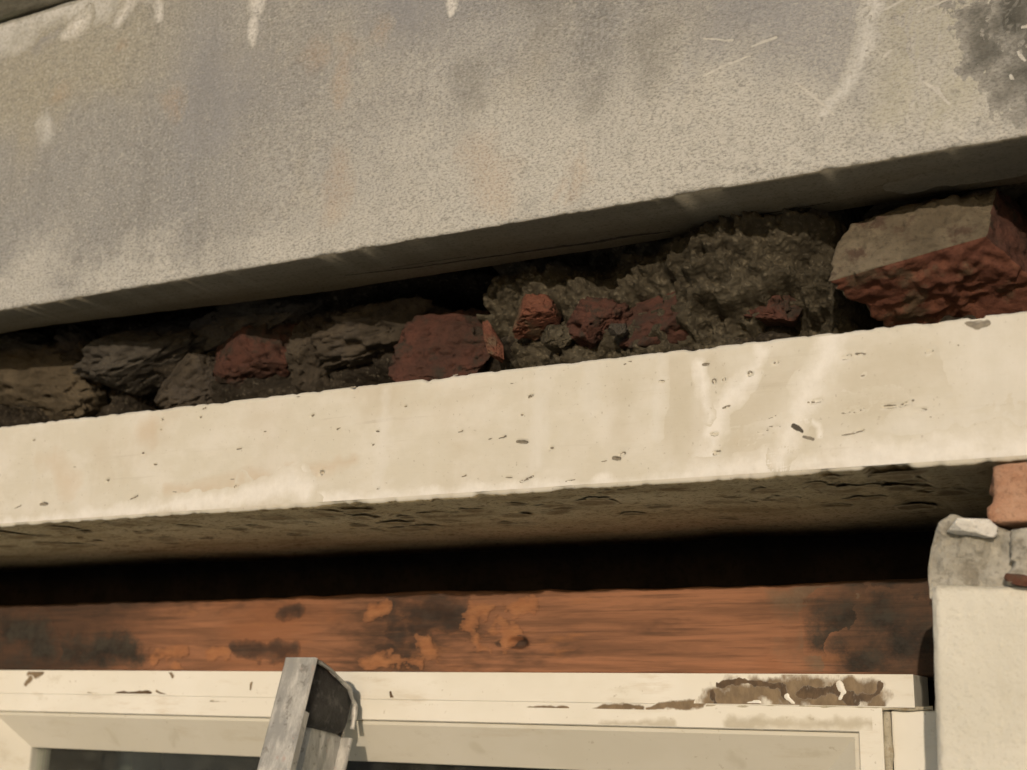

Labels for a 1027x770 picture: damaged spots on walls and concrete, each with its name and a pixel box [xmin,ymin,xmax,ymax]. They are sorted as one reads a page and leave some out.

water stain [352,0,1027,194]
peeling [694,674,898,706]